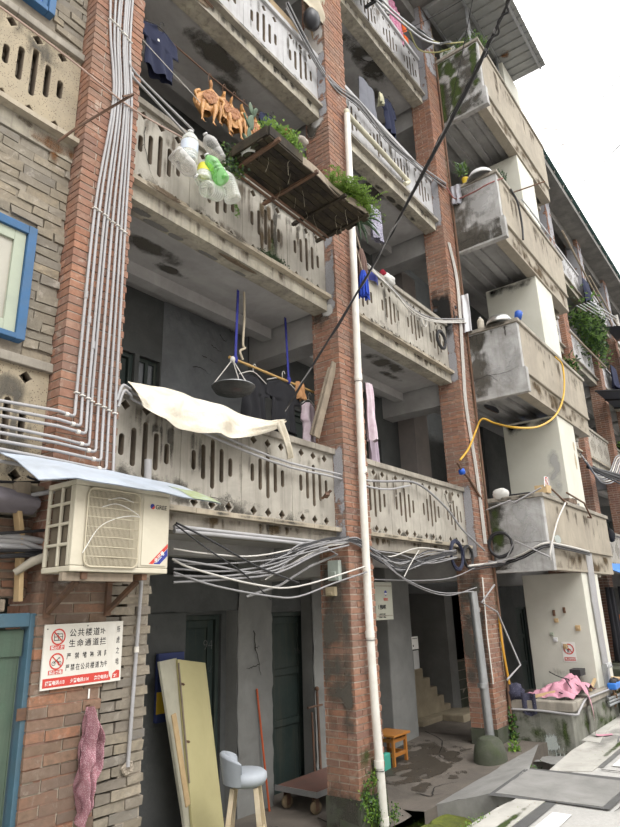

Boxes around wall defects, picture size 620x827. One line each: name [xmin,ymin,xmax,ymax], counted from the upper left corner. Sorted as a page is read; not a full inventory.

leakage [184,30,240,98]
leakage [437,42,483,123]
leakage [129,235,181,276]
leakage [469,330,511,398]
crack [248,631,261,673]